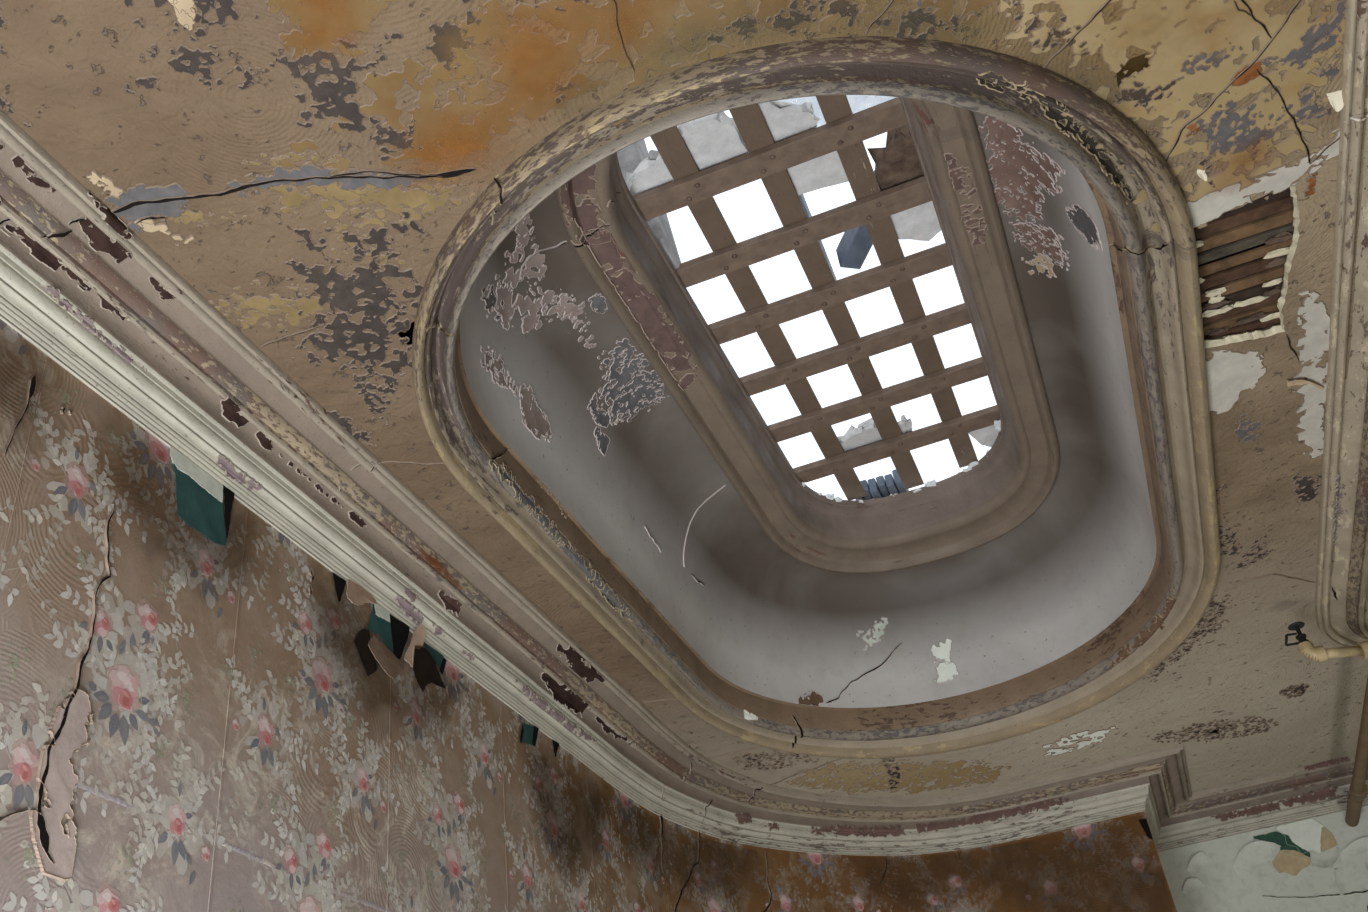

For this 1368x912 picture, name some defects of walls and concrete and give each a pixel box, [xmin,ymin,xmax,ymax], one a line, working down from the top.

crack [1043,0,1112,69]
crack [1164,0,1368,164]
crack [40,167,504,239]
flaking render [78,0,482,451]
peeling [976,0,1368,546]
flaking render [169,446,262,503]
spalling [374,589,464,637]
crack [0,509,115,865]
peeling [515,643,634,748]
crack [826,642,902,704]
peeling [930,638,959,684]
crack [1262,890,1368,911]